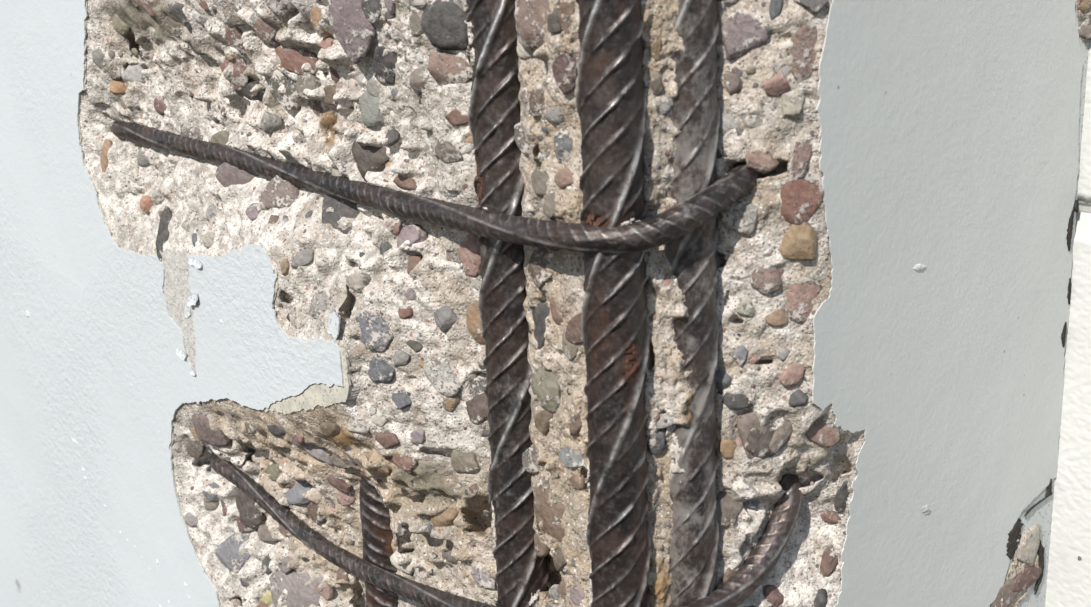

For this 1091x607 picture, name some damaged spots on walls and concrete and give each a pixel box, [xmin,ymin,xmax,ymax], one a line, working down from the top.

corrosion [320,110,337,146]
corrosion [474,168,483,208]
spalling [514,0,583,223]
spalling [641,0,685,219]
spalling [80,0,498,607]
spalling [715,0,865,607]
spalling [522,245,591,607]
spalling [645,245,693,607]
corrosion [381,530,394,554]
corrosion [652,562,668,606]
spalling [990,524,1042,607]